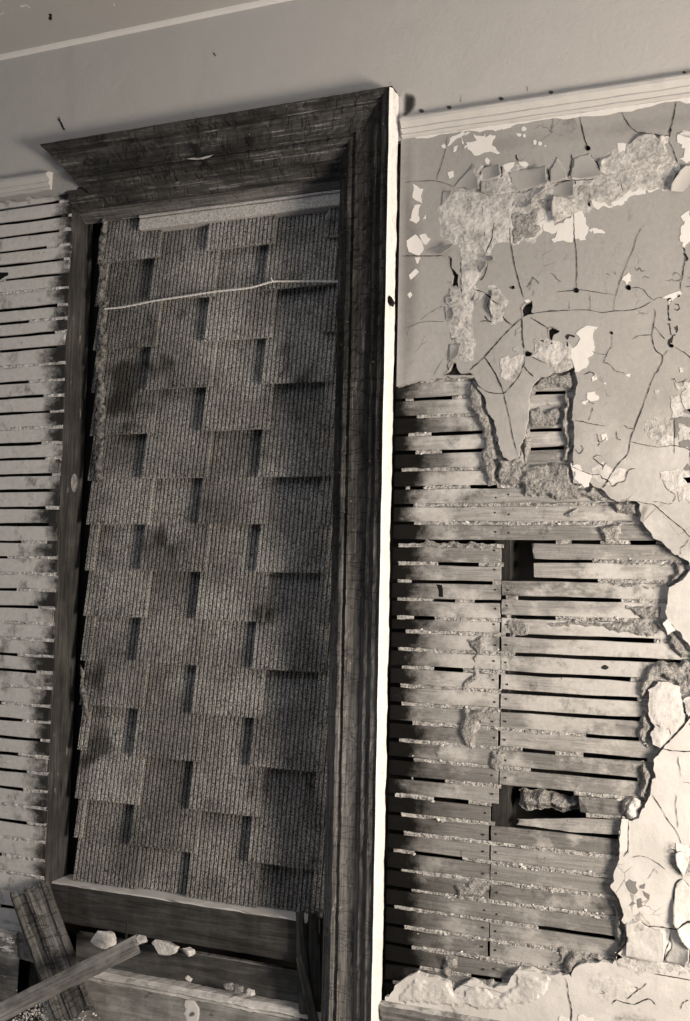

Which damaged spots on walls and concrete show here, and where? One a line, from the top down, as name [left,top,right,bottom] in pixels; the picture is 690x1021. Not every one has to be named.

crack [622,101,679,179]
spalling [0,201,61,239]
spalling [0,246,60,281]
spalling [0,304,58,353]
crack [407,120,690,487]
spalling [0,442,46,461]
spalling [67,223,103,875]
peeling [381,97,690,1001]
crack [641,486,690,554]
crack [600,702,690,1009]
spalling [17,959,30,994]
spalling [65,923,297,968]